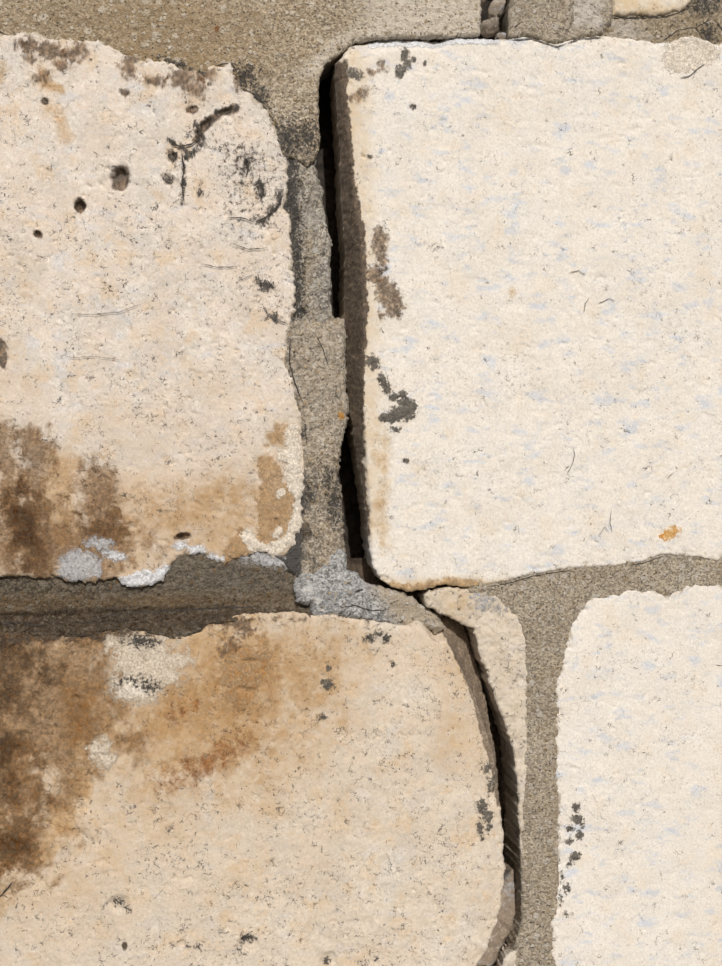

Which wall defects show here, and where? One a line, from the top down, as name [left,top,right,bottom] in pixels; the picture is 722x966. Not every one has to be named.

crack [477,0,602,49]
crack [168,137,200,198]
crack [230,157,282,222]
crack [314,73,340,367]
crack [337,427,459,611]
water stain [57,535,128,582]
water stain [118,565,170,587]
water stain [172,540,225,563]
water stain [238,552,299,569]
water stain [362,631,391,644]
water stain [320,664,335,691]
crack [482,689,505,863]